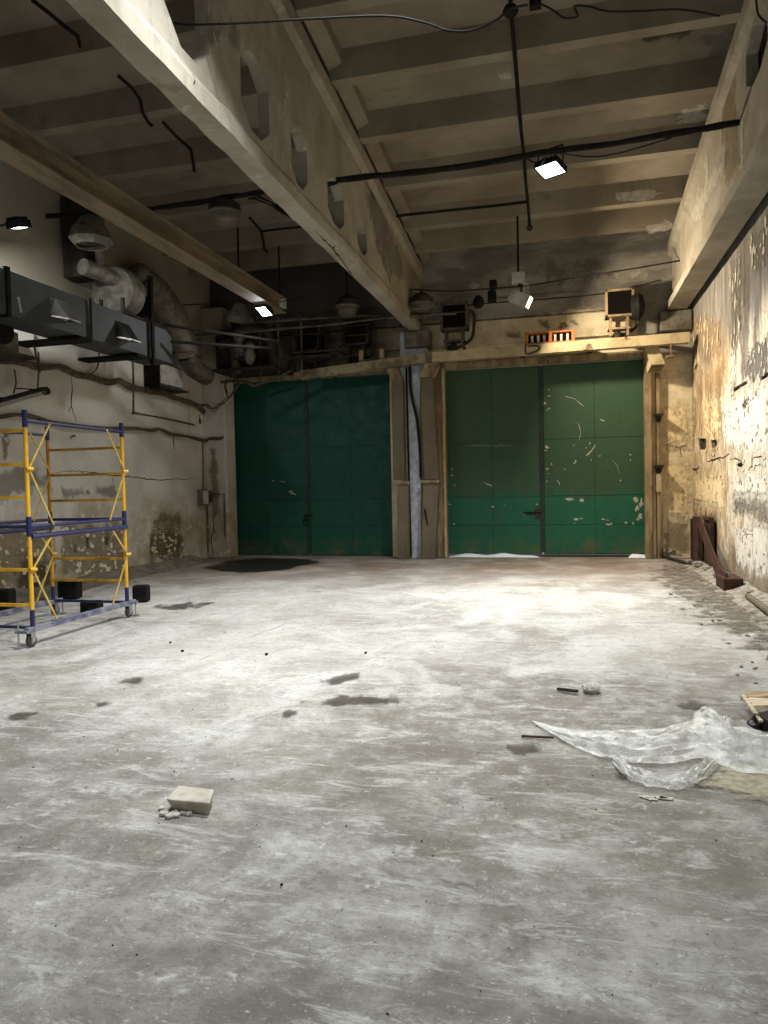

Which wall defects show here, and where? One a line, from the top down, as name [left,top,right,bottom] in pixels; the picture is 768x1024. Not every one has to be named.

peeling [661,214,768,580]
peeling [602,497,644,525]
crack [671,445,762,512]
flaking render [0,521,124,589]
flaking render [149,531,186,561]
leakage [206,558,317,572]